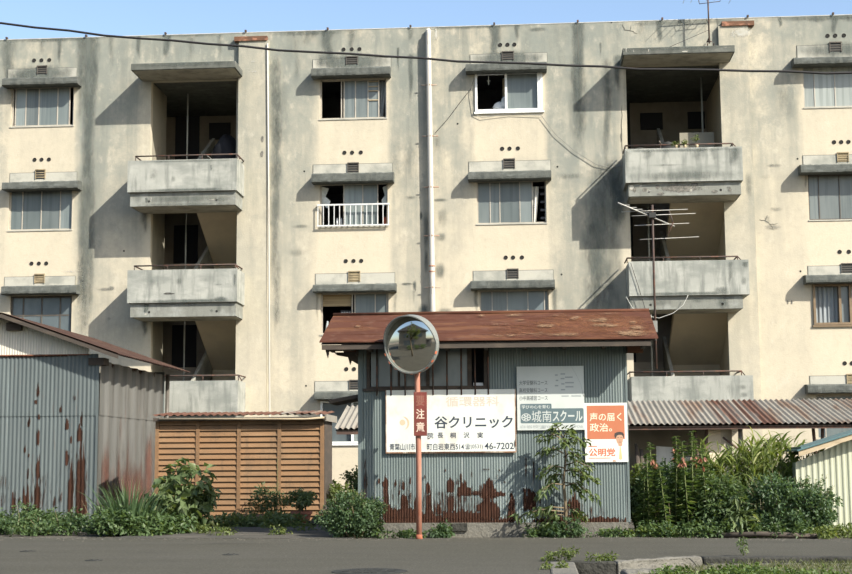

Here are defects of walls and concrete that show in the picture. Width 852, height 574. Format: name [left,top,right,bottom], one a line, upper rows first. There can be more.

water stain [79,38,97,160]
water stain [573,23,582,119]
water stain [80,178,92,291]
water stain [608,168,665,219]
rust [509,313,647,337]
rust [1,405,88,517]
rust [102,444,152,506]
rust [378,458,627,523]